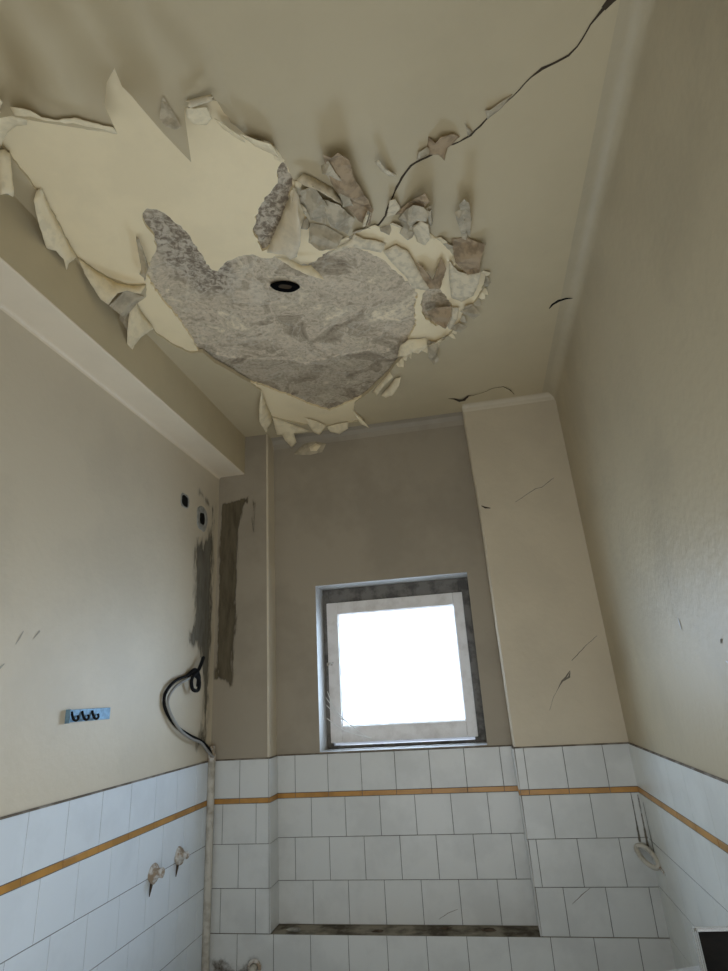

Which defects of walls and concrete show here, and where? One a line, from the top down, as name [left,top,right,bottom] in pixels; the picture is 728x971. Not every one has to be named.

crack [368,0,616,228]
peeling [2,68,491,455]
crack [550,637,595,708]